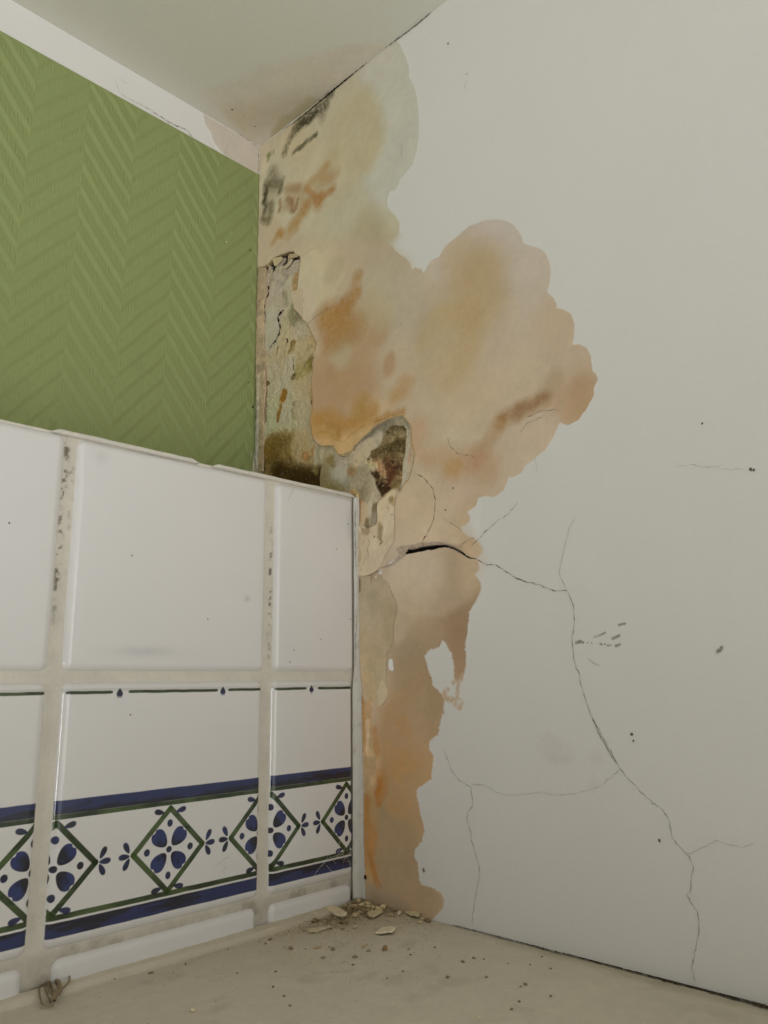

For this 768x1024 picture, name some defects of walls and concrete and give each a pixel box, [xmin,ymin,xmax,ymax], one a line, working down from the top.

spalling [253,251,415,576]
leakage [184,28,600,509]
leakage [363,610,472,920]
crack [358,475,768,1008]